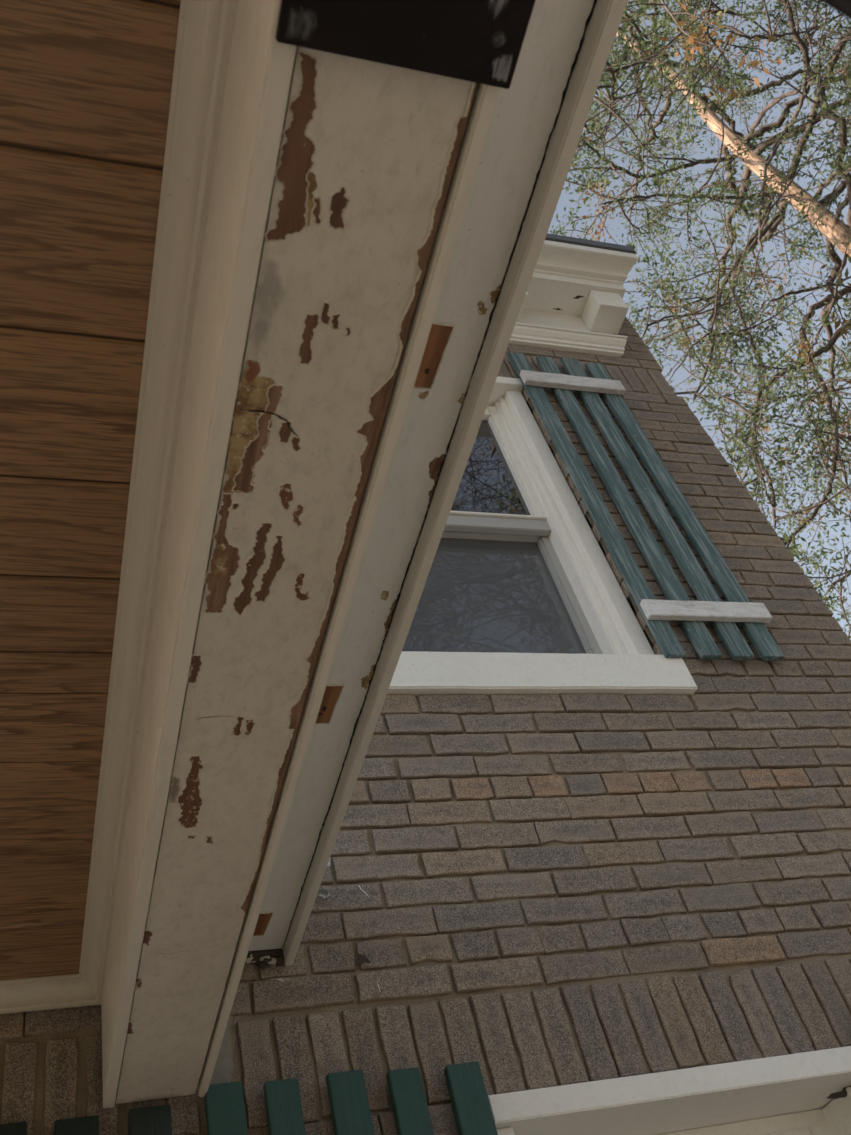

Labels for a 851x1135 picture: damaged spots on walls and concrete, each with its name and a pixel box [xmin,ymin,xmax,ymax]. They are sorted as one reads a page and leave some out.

peeling [264,49,351,243]
peeling [204,360,302,616]
peeling [239,83,477,937]
peeling [177,754,214,845]
flaking render [244,949,285,969]